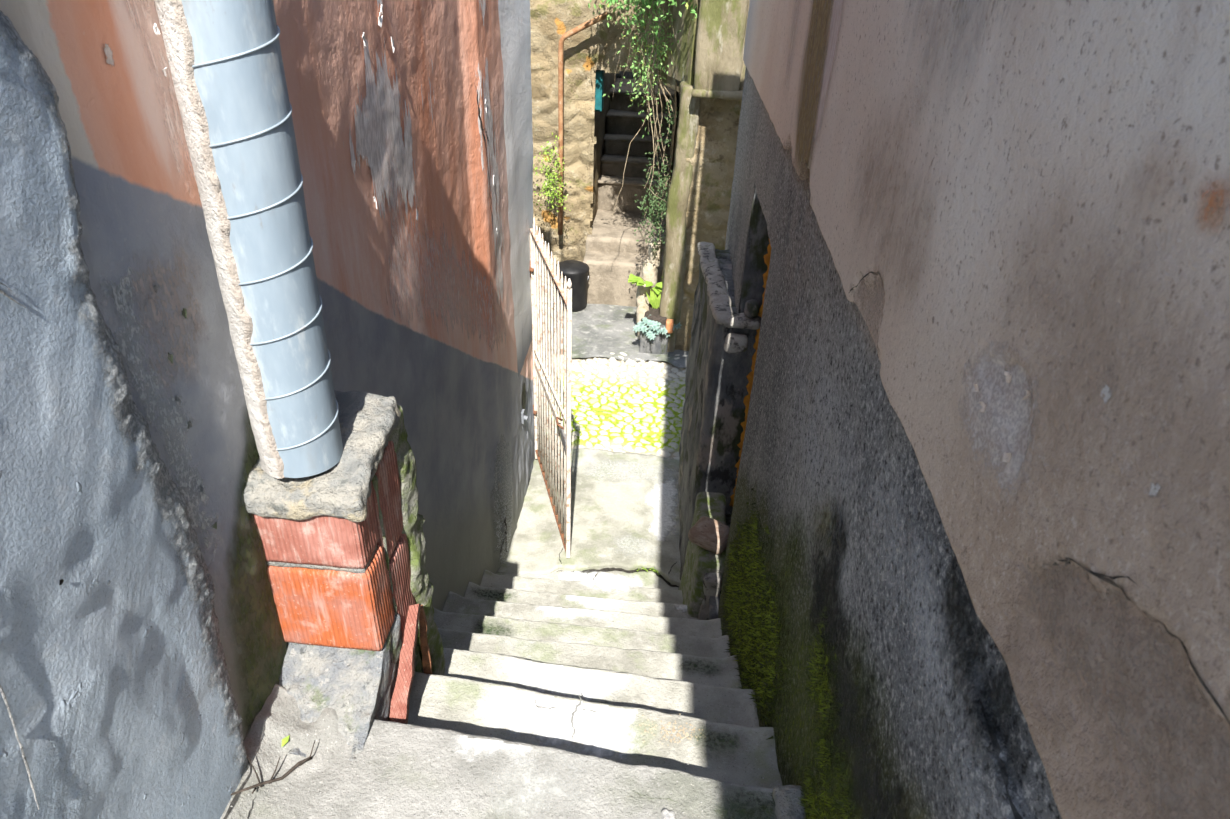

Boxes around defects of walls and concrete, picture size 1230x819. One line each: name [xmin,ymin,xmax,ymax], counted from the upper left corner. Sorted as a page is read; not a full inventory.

peeling [343,0,435,221]
spalling [962,353,1037,488]
crack [534,692,601,743]
water stain [810,504,906,819]
water stain [944,559,1020,770]
crack [981,704,1023,819]
crack [1053,557,1230,724]